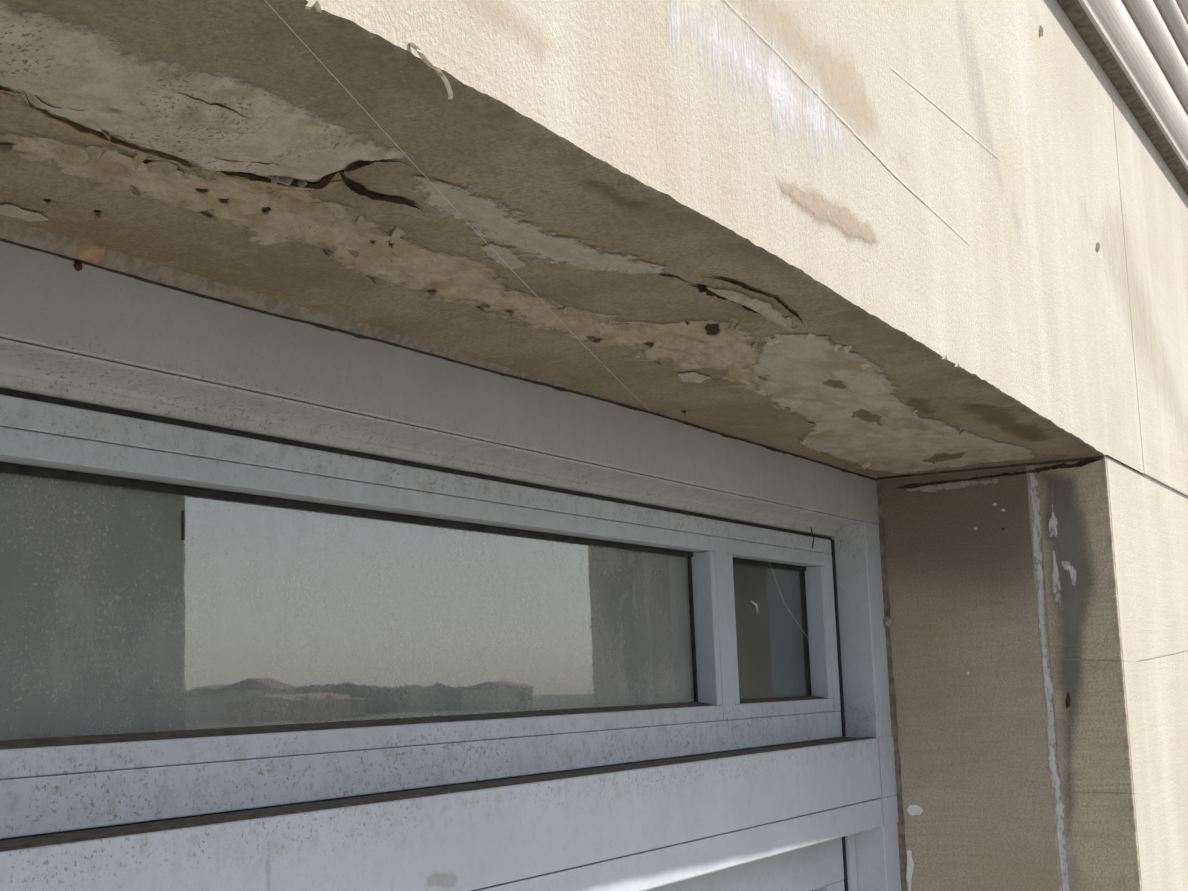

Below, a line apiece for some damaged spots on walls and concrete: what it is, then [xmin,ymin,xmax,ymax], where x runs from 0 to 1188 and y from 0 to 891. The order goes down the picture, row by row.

peeling [305,0,323,13]
crack [0,87,422,211]
spalling [0,2,1036,474]
peeling [906,478,1000,492]
water stain [1029,471,1091,891]